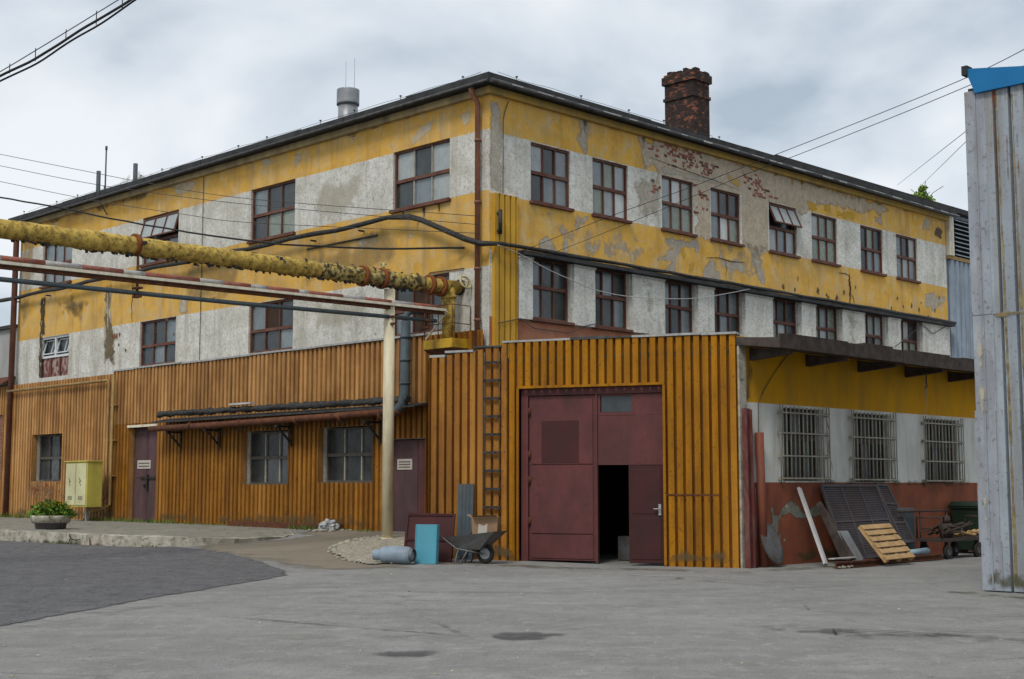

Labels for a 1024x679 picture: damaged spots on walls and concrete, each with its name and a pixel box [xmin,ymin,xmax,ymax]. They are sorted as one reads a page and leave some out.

peeling [577,119,589,154]
flaking render [635,136,886,284]
peeling [539,214,642,260]
damp [104,287,115,365]
flaking render [770,501,820,548]